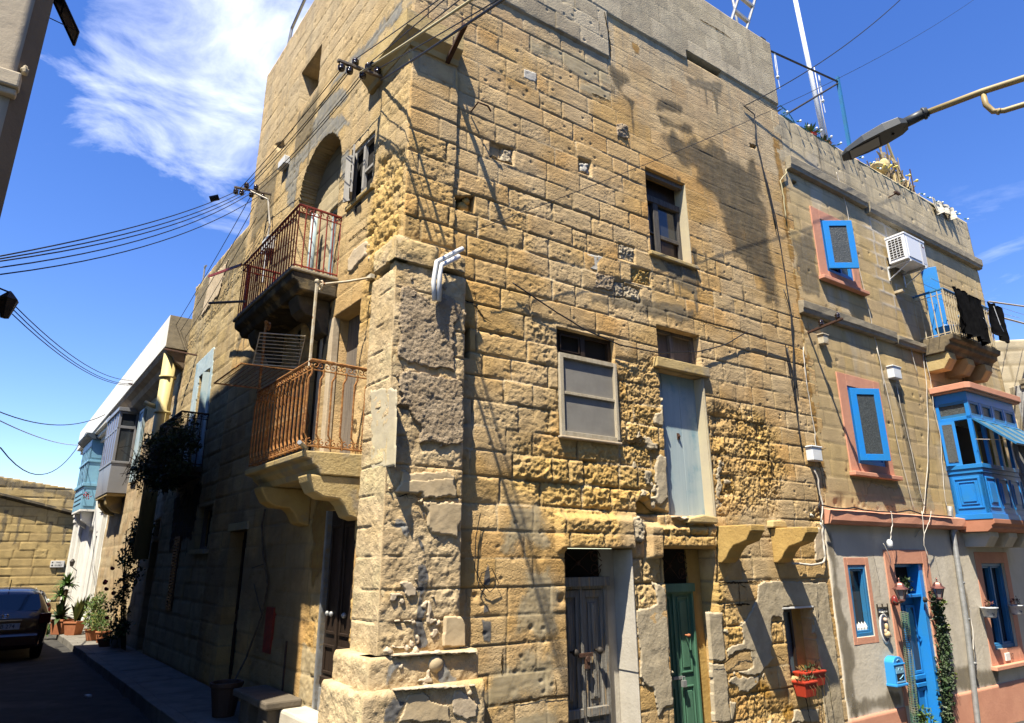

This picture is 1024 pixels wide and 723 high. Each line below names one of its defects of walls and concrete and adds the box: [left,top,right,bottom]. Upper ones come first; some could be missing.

flaking render [383,578,441,670]